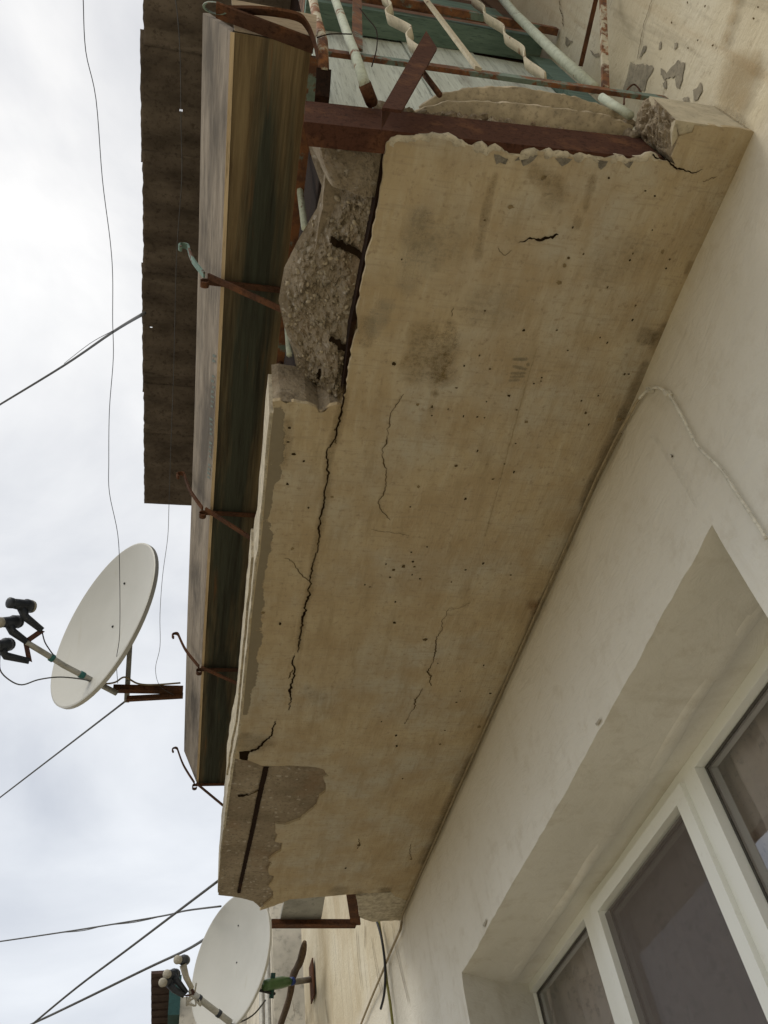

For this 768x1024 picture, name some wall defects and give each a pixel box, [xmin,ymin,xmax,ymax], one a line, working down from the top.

flaking render [623,40,702,101]
crack [622,98,716,182]
spalling [278,132,662,397]
crack [371,394,409,536]
crack [239,385,346,760]
crack [406,603,469,722]
spalling [218,758,326,907]